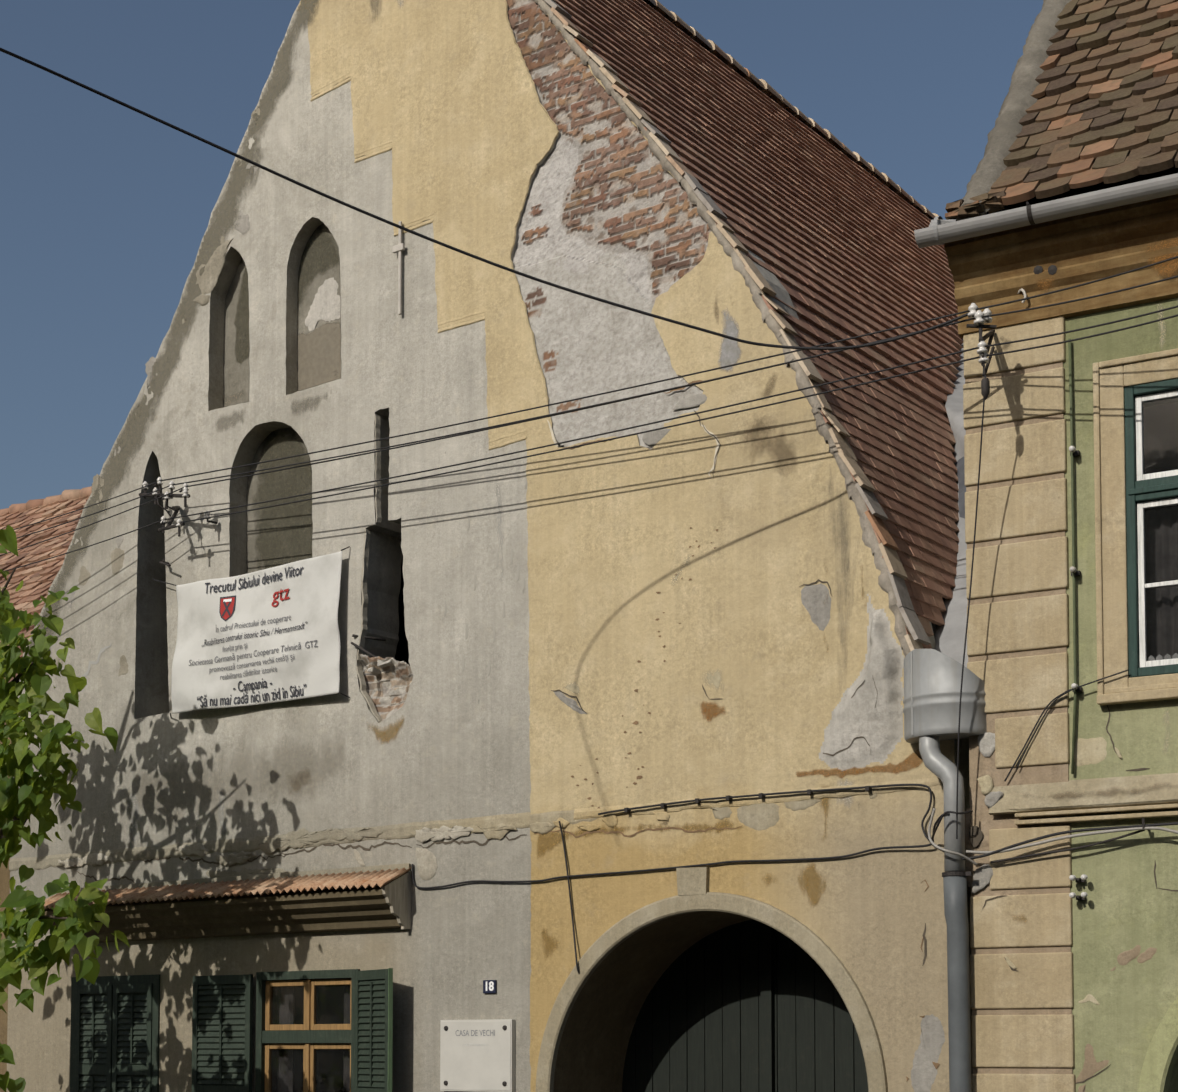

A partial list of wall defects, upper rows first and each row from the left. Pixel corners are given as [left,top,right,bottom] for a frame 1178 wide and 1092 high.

spalling [504,0,711,450]
spalling [193,239,232,306]
peeling [297,226,341,391]
crack [694,410,721,478]
peeling [799,579,832,631]
spalling [356,653,413,742]
spalling [551,683,587,714]
peeling [142,758,821,880]
peeling [58,853,136,884]
peeling [906,1014,945,1092]